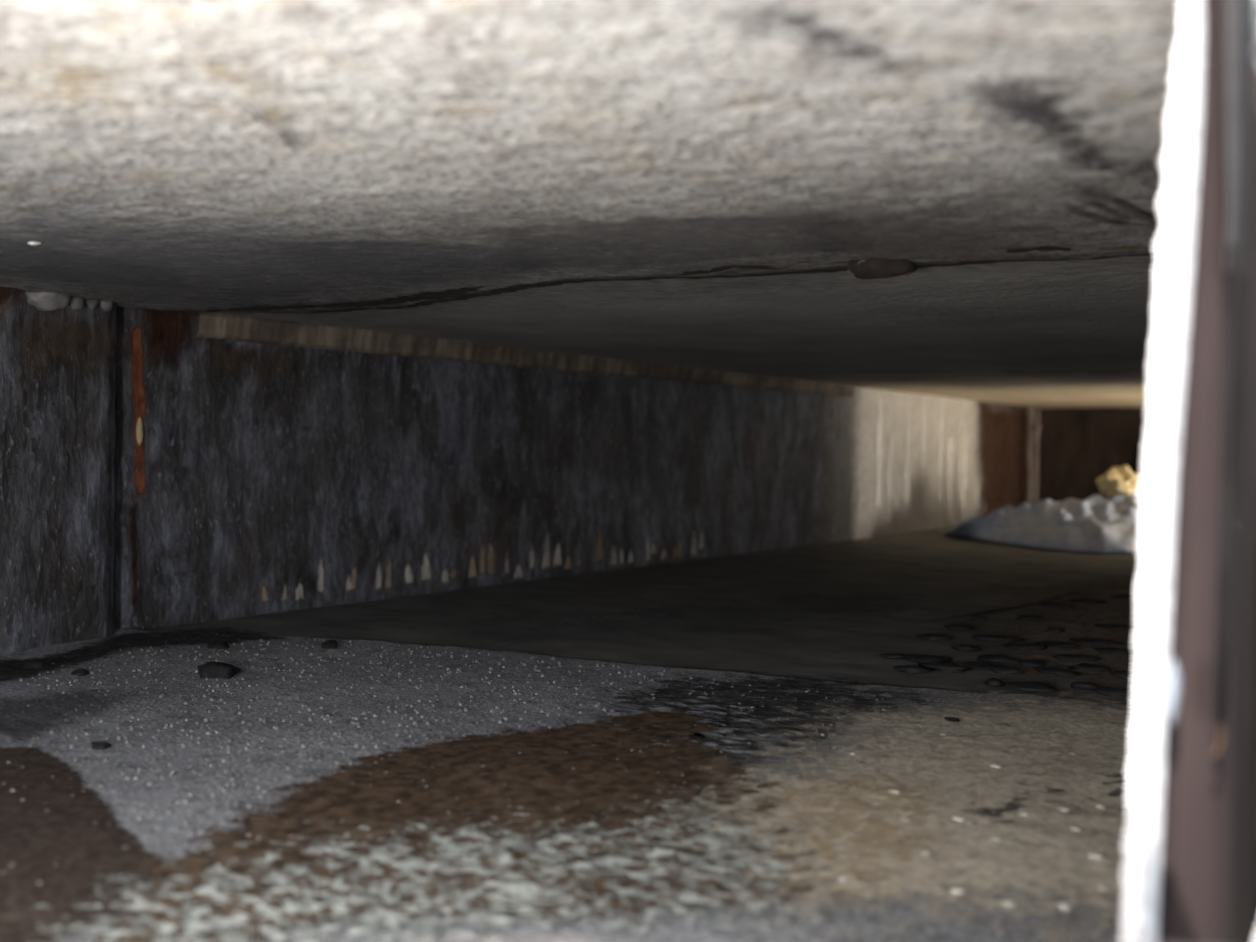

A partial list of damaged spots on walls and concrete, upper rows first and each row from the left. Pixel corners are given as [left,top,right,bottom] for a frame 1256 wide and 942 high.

damp [970,79,1165,196]
crack [915,183,1163,268]
crack [184,266,848,313]
rust [129,308,198,605]